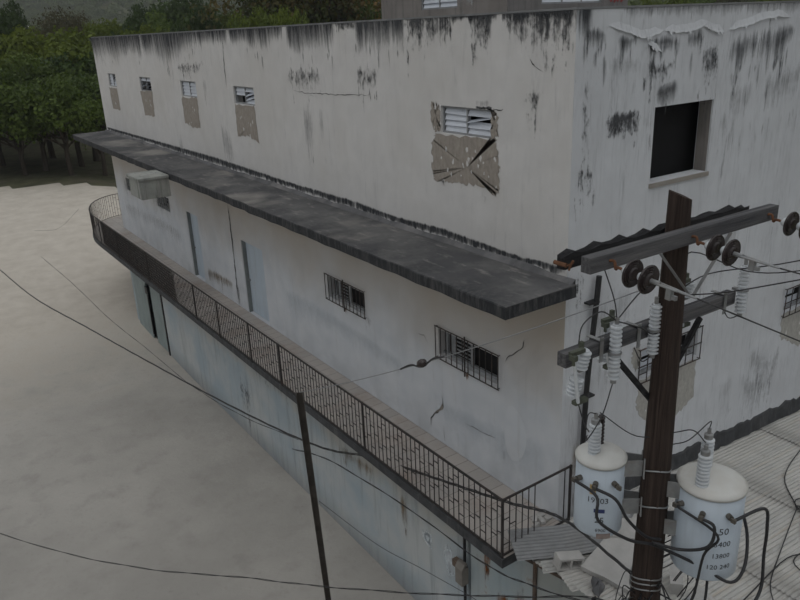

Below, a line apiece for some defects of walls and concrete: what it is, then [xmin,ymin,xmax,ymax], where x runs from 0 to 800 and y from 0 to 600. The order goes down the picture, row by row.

leakage [89,9,603,61]
leakage [643,39,677,99]
peeling [608,9,790,52]
leakage [733,29,792,76]
peeling [109,87,120,110]
peeling [140,90,155,117]
peeling [182,97,200,130]
peeling [235,104,259,147]
leakage [608,111,639,137]
peeling [430,101,500,202]
peeling [635,376,650,420]
peeling [675,360,696,416]